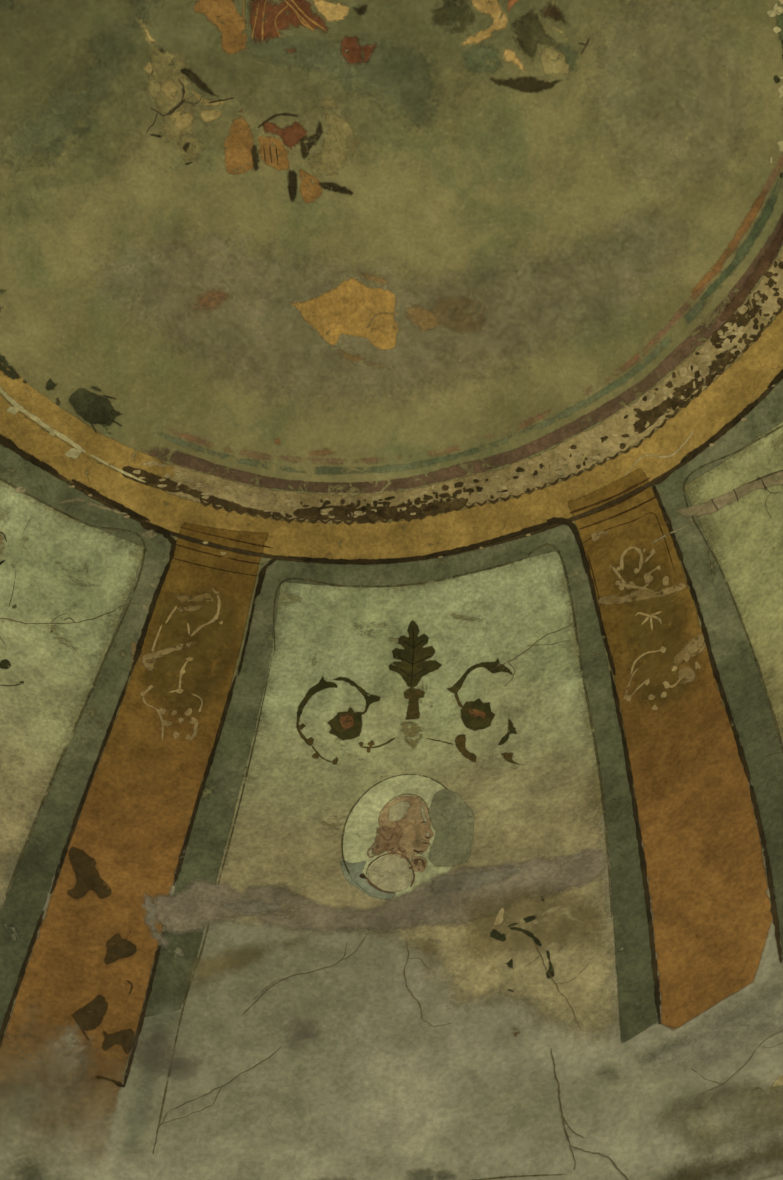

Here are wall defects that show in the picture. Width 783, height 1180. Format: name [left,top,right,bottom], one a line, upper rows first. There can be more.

peeling [293,273,438,367]
peeling [0,387,146,483]
crack [153,1046,282,1154]
crack [550,1049,629,1180]
damp [664,1141,783,1180]